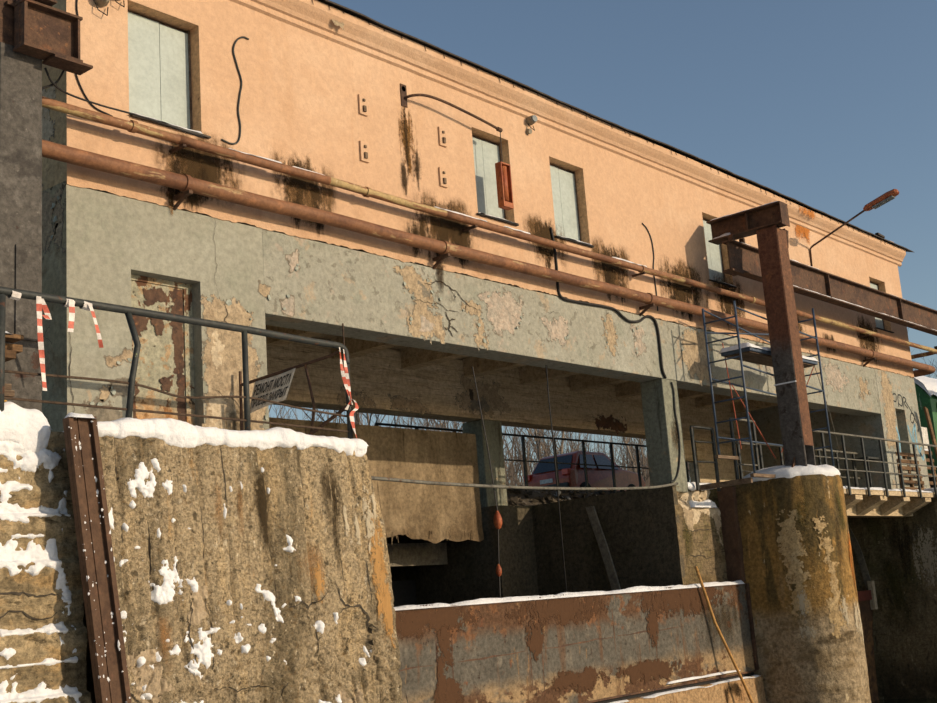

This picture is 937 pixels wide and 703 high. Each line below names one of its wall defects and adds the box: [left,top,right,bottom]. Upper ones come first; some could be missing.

damp [160,138,238,188]
damp [275,157,334,212]
damp [408,196,470,247]
peeling [393,261,448,344]
crack [415,276,476,336]
peeling [460,287,526,351]
damp [660,261,745,326]
peeling [200,294,268,431]
spalling [775,509,850,639]
crack [189,600,288,702]
crack [289,581,378,650]
rust [395,587,725,703]